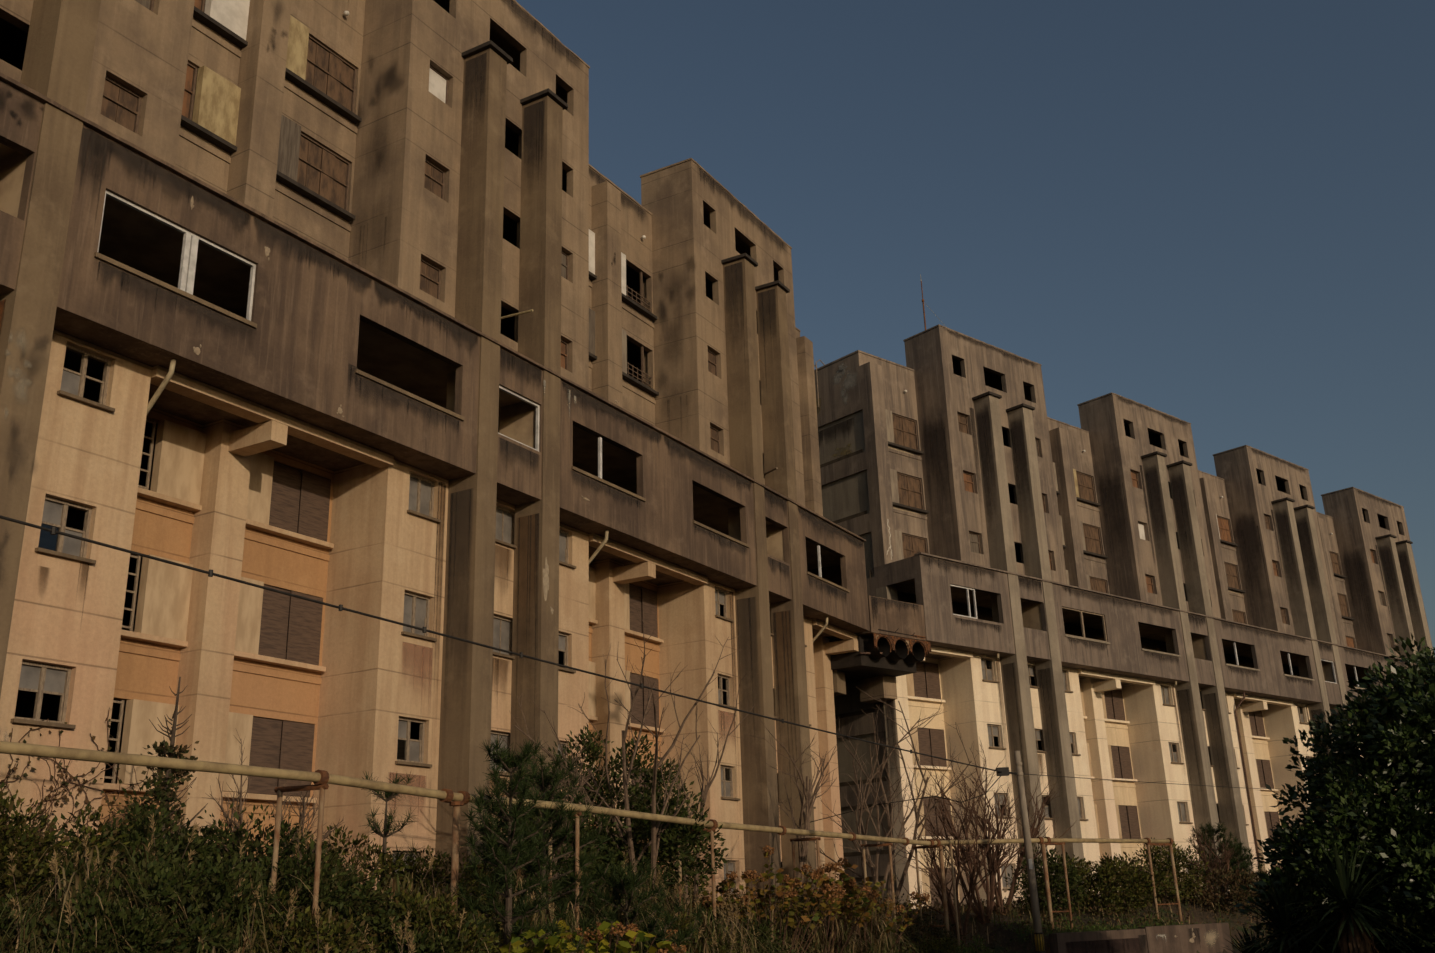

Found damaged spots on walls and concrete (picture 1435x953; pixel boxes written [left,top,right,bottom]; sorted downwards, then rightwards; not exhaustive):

leakage [79,127,478,349]
leakage [725,262,776,328]
leakage [500,349,863,546]
leakage [1252,449,1305,471]
leakage [1100,478,1126,534]
leakage [1140,465,1190,538]
leakage [1234,510,1315,580]
leakage [1344,545,1415,608]